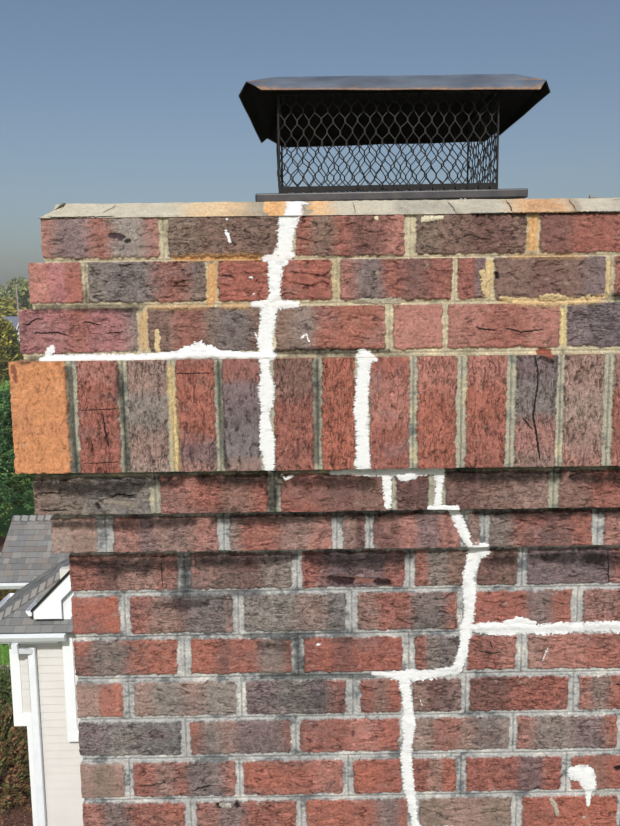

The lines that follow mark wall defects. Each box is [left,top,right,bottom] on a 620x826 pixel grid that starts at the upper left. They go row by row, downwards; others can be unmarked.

crack [48,203,116,218]
crack [24,318,68,336]
crack [522,357,540,459]
crack [82,408,118,464]
crack [35,492,70,511]